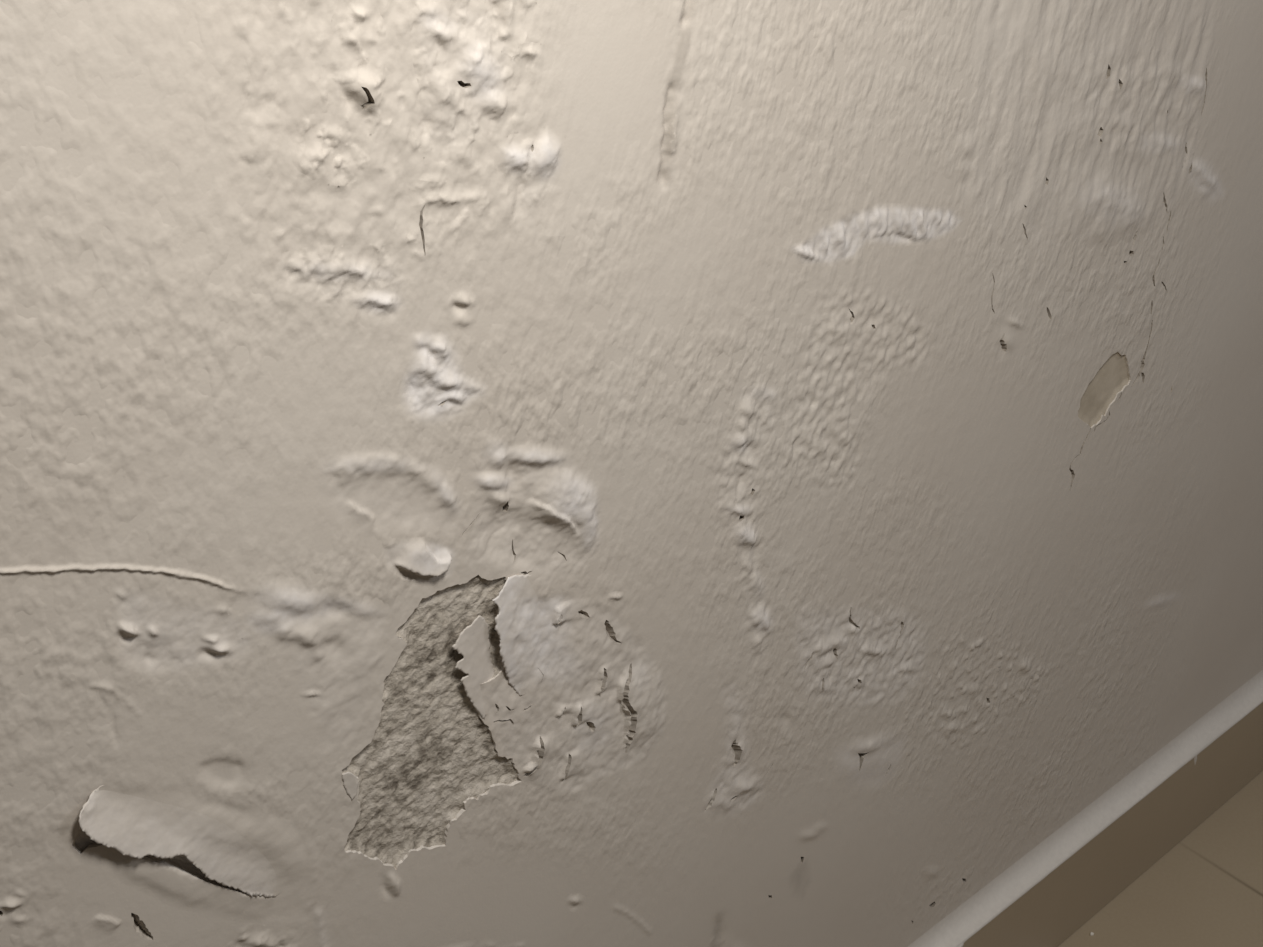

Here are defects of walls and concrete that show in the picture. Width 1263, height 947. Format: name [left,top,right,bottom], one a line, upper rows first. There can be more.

peeling [1078,352,1131,432]
crack [1069,427,1091,489]
peeling [307,433,671,903]
peeling [78,785,279,897]